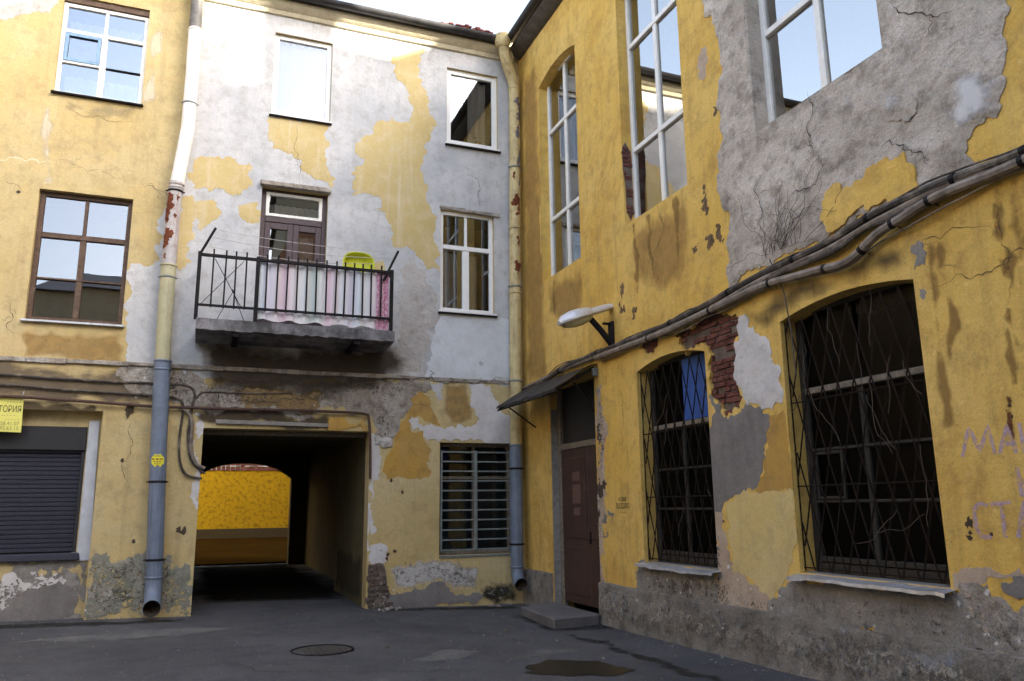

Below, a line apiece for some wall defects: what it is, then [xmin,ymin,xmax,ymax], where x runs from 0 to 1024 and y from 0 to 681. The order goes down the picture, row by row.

crack [892,5,954,31]
spalling [692,0,1011,288]
flaking render [115,207,166,399]
corrosion [163,192,180,258]
flaking render [169,1,522,609]
water stain [633,197,683,291]
flaking render [679,311,794,494]
water stain [938,302,960,424]
crack [922,196,1023,306]
water stain [993,205,1019,237]
water stain [1006,331,1016,382]
spalling [595,384,1024,681]